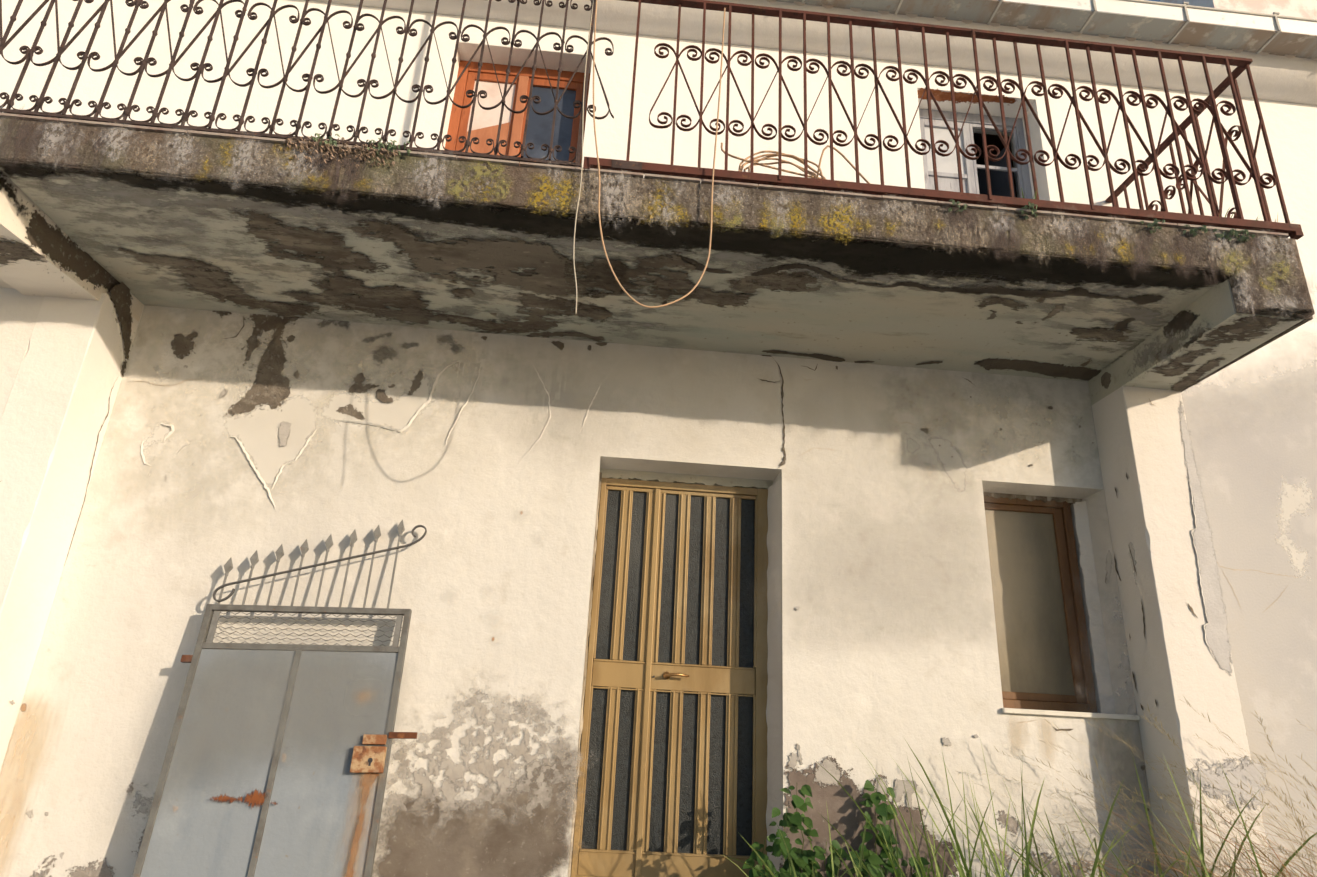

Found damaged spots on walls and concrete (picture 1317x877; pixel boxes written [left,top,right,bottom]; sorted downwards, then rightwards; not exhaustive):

leakage [0,117,1270,357]
flaking render [0,210,133,376]
flaking render [28,164,1076,510]
crack [760,358,832,466]
flaking render [974,358,1111,389]
peeling [1093,281,1145,296]
flaking render [1059,307,1313,391]
peeling [1277,479,1312,576]
peeling [30,852,115,877]
peeling [127,782,155,854]
leakage [372,690,582,877]
peeling [1187,756,1270,810]